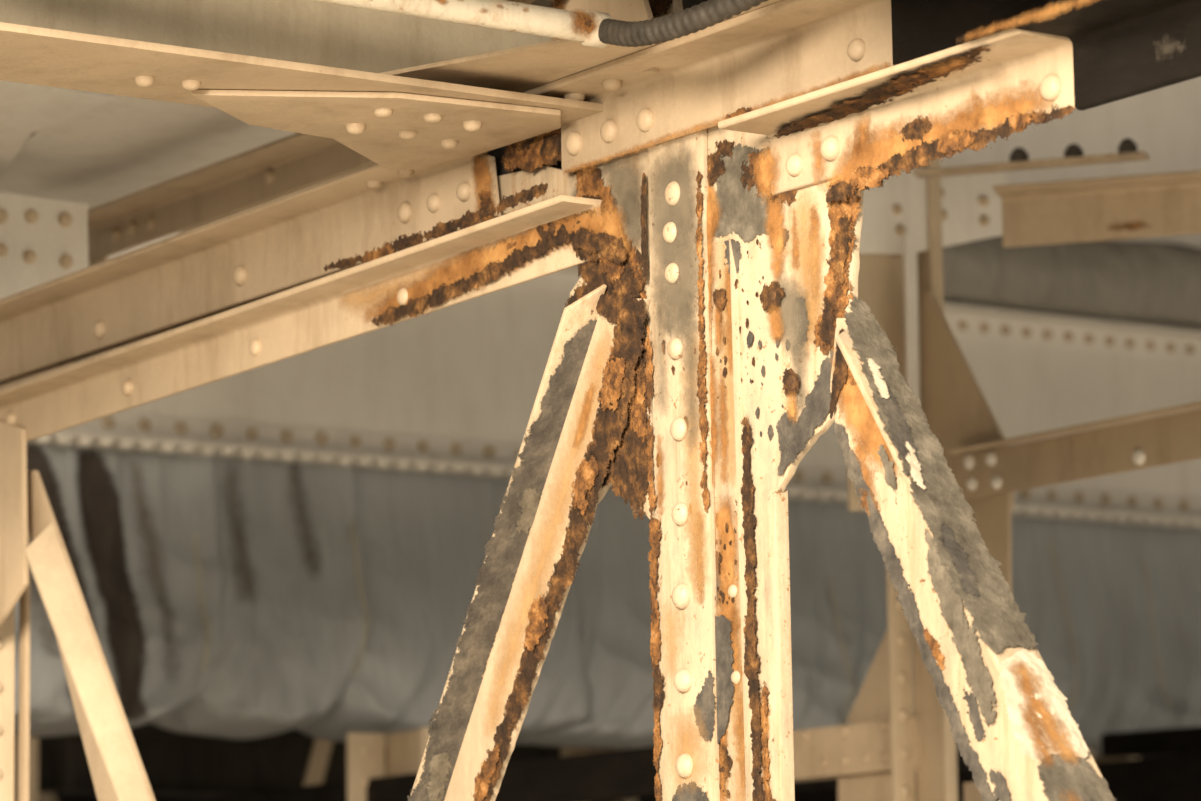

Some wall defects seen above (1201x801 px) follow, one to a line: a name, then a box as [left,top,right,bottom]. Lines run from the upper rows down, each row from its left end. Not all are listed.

damp [27,444,147,720]
peeling [407,318,598,801]
corrosion [324,0,1093,801]
peeling [693,499,737,744]
peeling [712,143,834,476]
peeling [844,296,1116,801]
peeling [672,780,709,801]